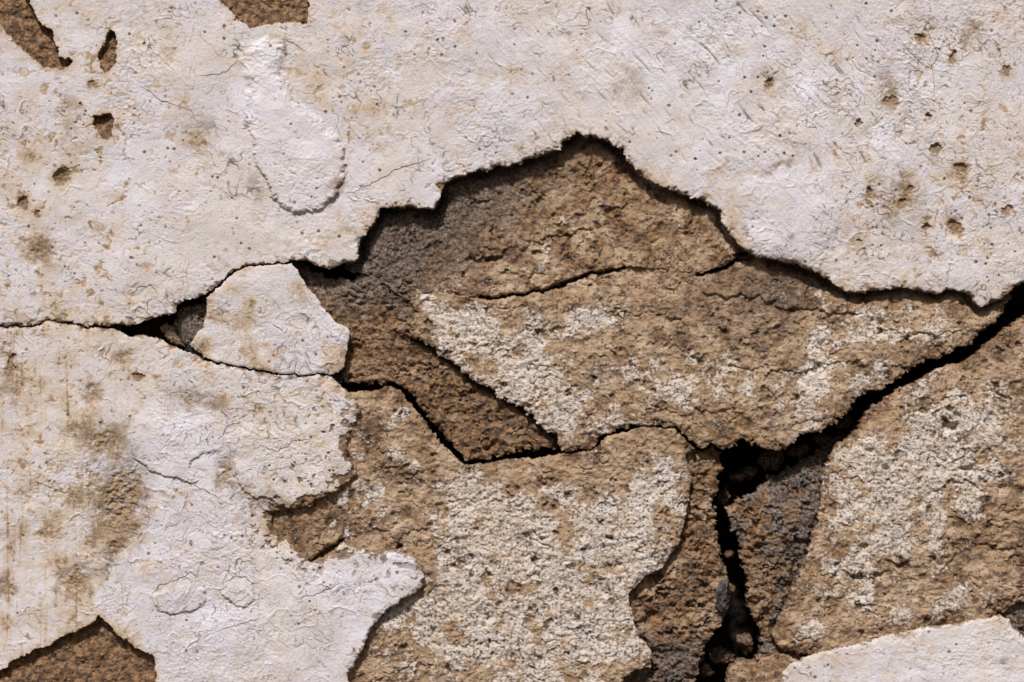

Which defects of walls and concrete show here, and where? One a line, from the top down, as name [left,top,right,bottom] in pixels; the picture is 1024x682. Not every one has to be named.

flaking render [0,0,73,71]
flaking render [87,29,117,89]
flaking render [220,0,310,29]
spalling [127,132,1024,682]
crack [0,259,1024,682]
flaking render [0,615,157,682]